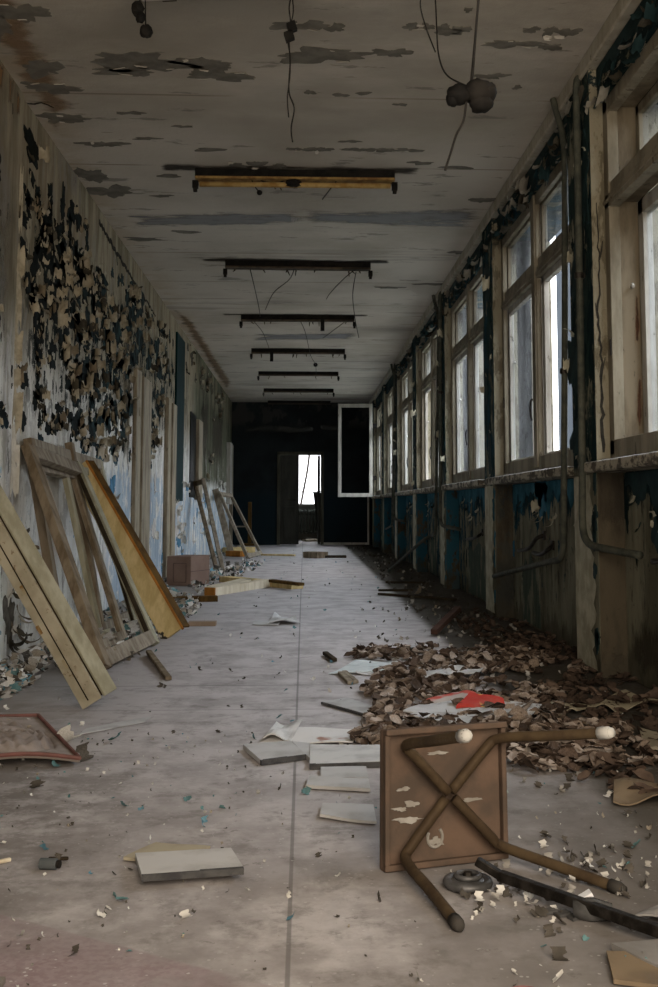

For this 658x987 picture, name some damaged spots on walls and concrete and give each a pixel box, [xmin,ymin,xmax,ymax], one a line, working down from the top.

peeling [91,51,255,82]
peeling [278,46,414,64]
peeling [286,140,474,169]
peeling [375,0,658,420]
peeling [0,124,225,509]
peeling [569,417,578,459]
peeling [175,481,215,555]
peeling [395,466,417,569]
peeling [436,412,447,585]
peeling [459,423,496,613]
flaking render [0,579,43,653]
peeling [513,473,601,671]